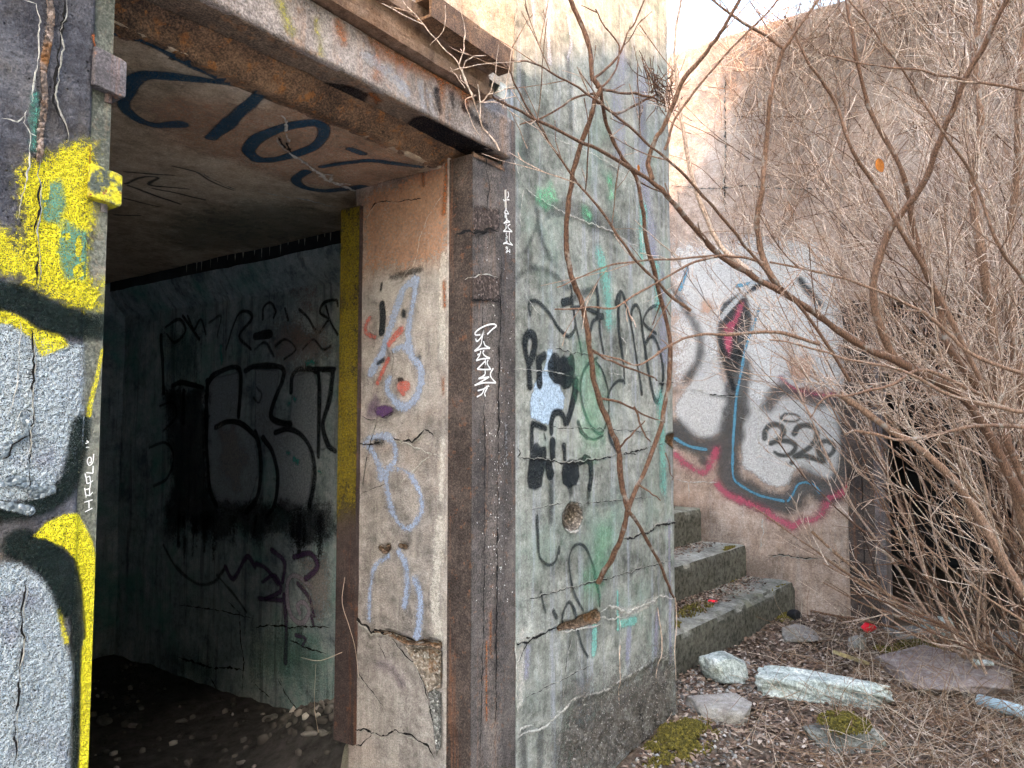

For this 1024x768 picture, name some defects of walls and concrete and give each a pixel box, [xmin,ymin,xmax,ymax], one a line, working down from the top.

crack [3,0,69,289]
crack [2,322,37,492]
crack [359,412,436,493]
crack [465,156,676,752]
crack [13,570,30,768]
crack [355,617,436,761]
spalling [373,630,442,754]